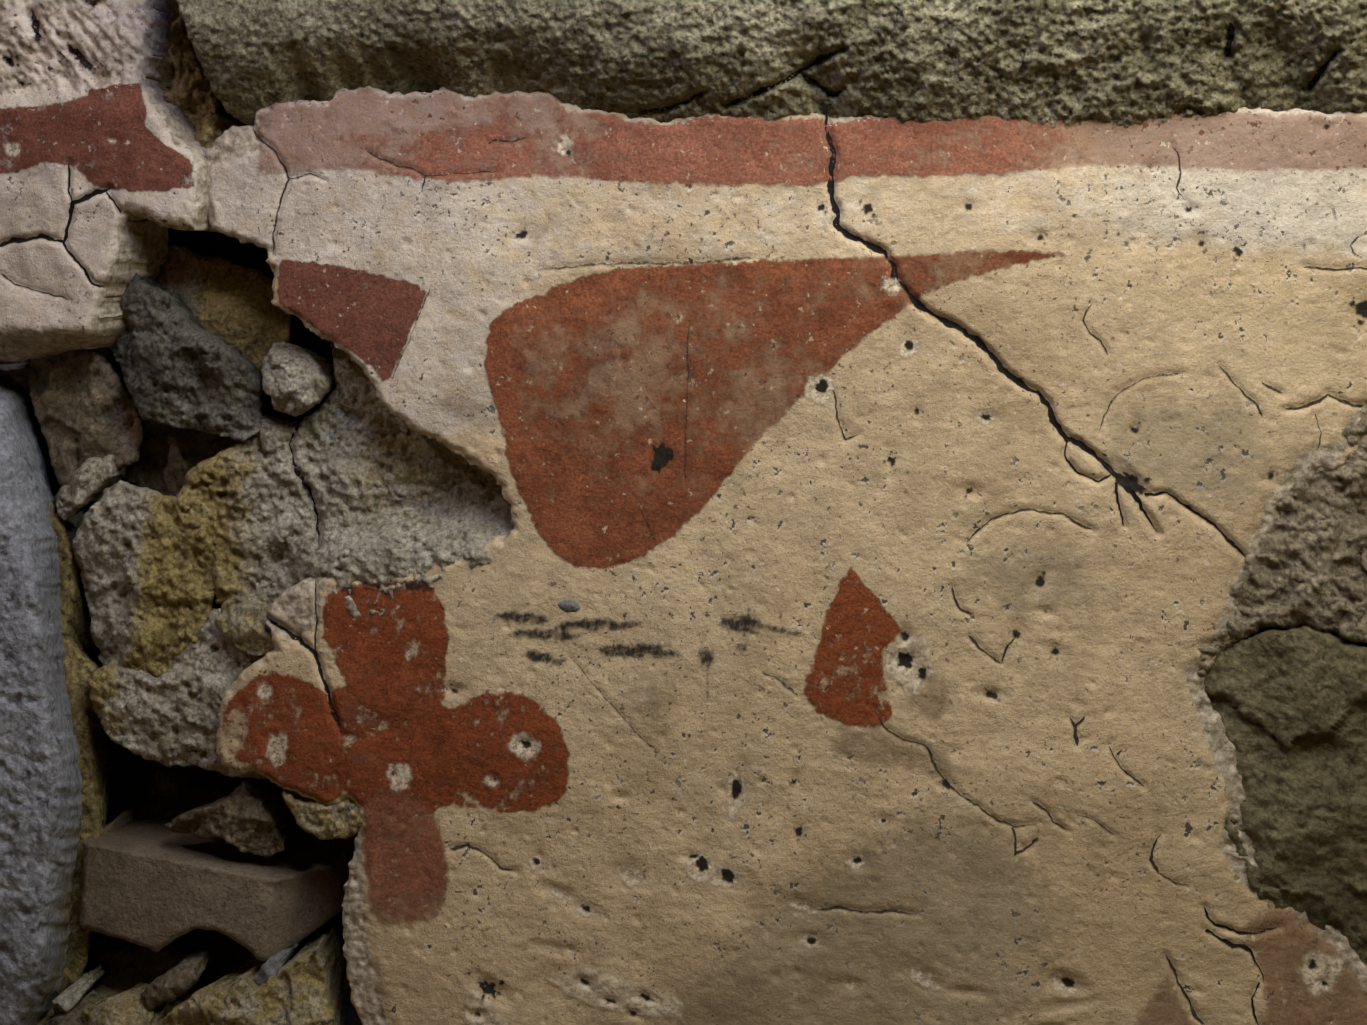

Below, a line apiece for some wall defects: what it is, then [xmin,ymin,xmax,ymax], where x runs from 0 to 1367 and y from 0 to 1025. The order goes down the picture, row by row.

crack [1224,23,1235,57]
crack [1308,51,1339,90]
crack [0,164,121,300]
crack [644,48,1245,557]
crack [1220,367,1363,450]
flaking render [175,341,514,620]
flaking render [1196,404,1367,677]
spalling [257,682,271,699]
crack [266,581,342,733]
spalling [266,733,287,767]
spalling [387,764,412,791]
spalling [1300,952,1343,996]